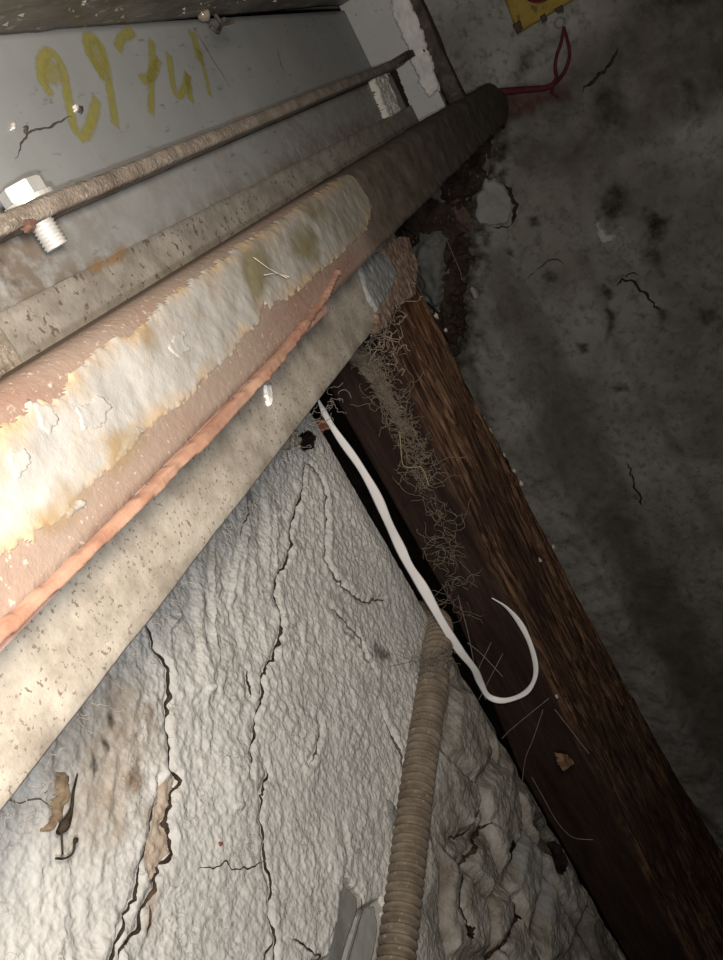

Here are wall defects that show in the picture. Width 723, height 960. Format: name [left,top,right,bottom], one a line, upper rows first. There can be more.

peeling [474,177,519,229]
crack [613,272,660,311]
peeling [0,174,373,558]
crack [627,463,644,508]
crack [200,463,384,960]
crack [378,701,403,769]
crack [109,626,182,960]
flaking render [144,774,173,880]
crack [448,810,493,925]